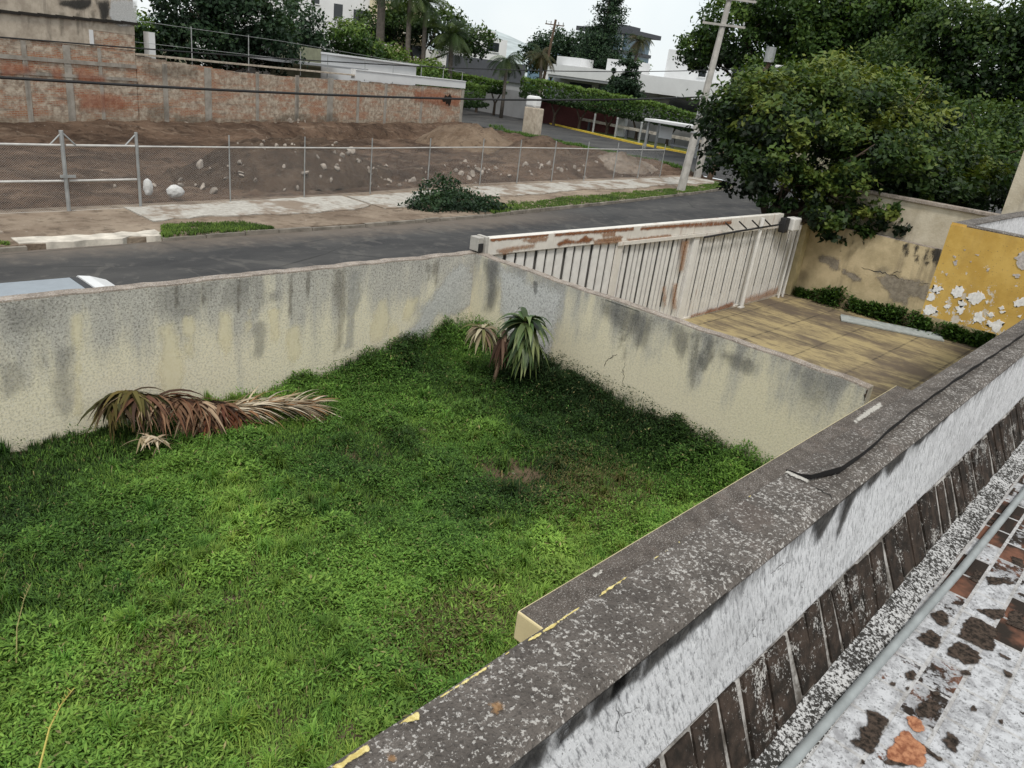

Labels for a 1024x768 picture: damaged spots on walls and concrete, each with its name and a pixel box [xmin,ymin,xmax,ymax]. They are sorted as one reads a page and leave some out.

corrosion [490,221,732,254]
corrosion [680,241,689,270]
peeling [877,249,1024,333]
damp [161,317,194,396]
peeling [970,570,1014,585]
peeling [916,608,1024,678]
peeling [890,670,917,690]
peeling [850,691,962,767]